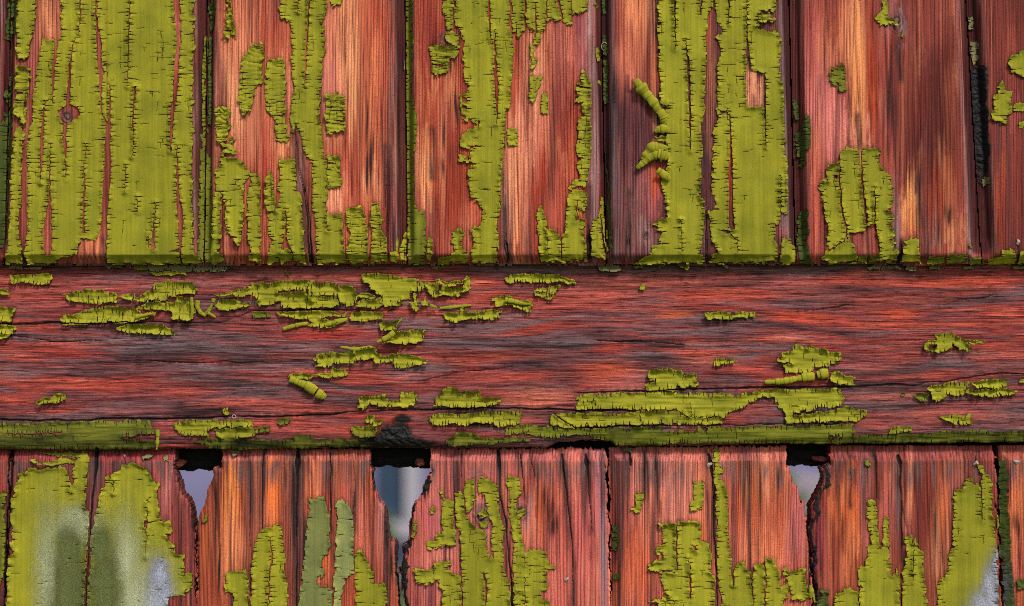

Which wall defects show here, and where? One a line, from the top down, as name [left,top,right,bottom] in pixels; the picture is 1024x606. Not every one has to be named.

peeling [0,0,1024,402]
peeling [36,393,67,406]
peeling [0,419,194,606]
peeling [173,392,417,457]
peeling [224,496,388,606]
peeling [411,344,1024,606]